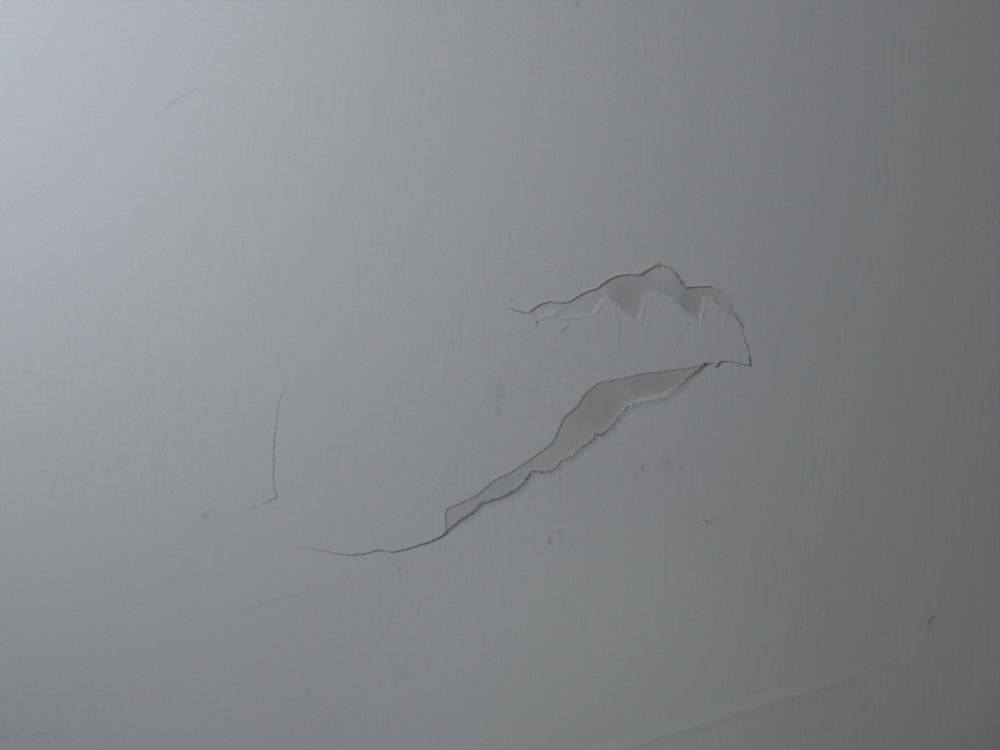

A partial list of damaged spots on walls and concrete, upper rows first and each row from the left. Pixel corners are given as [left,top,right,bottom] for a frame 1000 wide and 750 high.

peeling [505,261,745,326]
peeling [444,364,706,535]
crack [360,533,446,555]